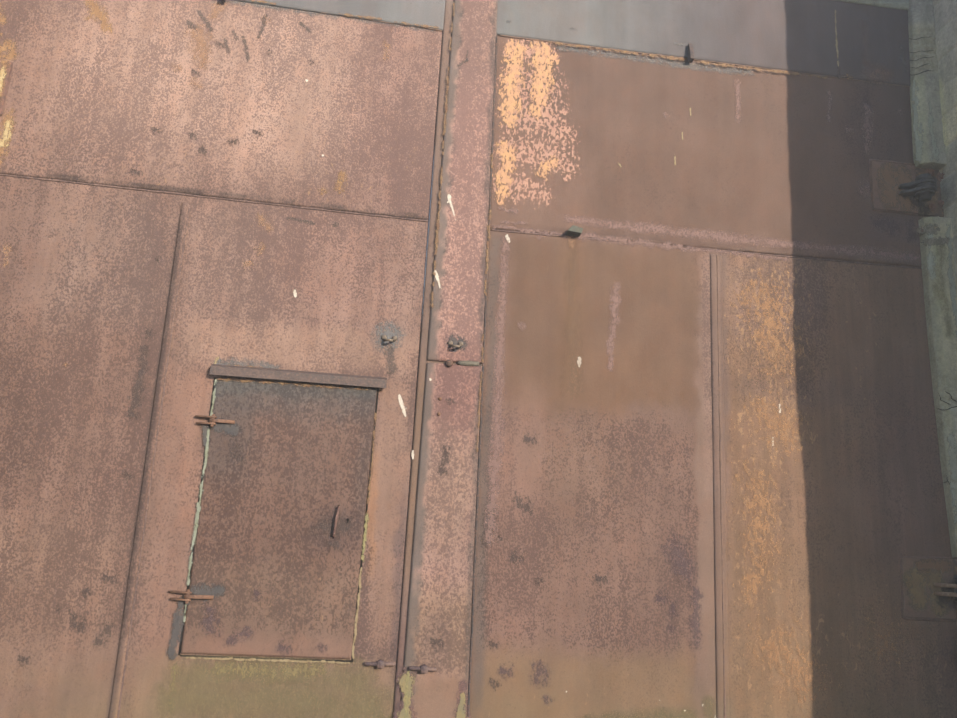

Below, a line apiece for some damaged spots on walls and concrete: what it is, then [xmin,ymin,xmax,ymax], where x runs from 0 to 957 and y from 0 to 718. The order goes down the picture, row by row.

corrosion [0,4,17,97]
corrosion [0,109,16,165]
peeling [492,39,581,209]